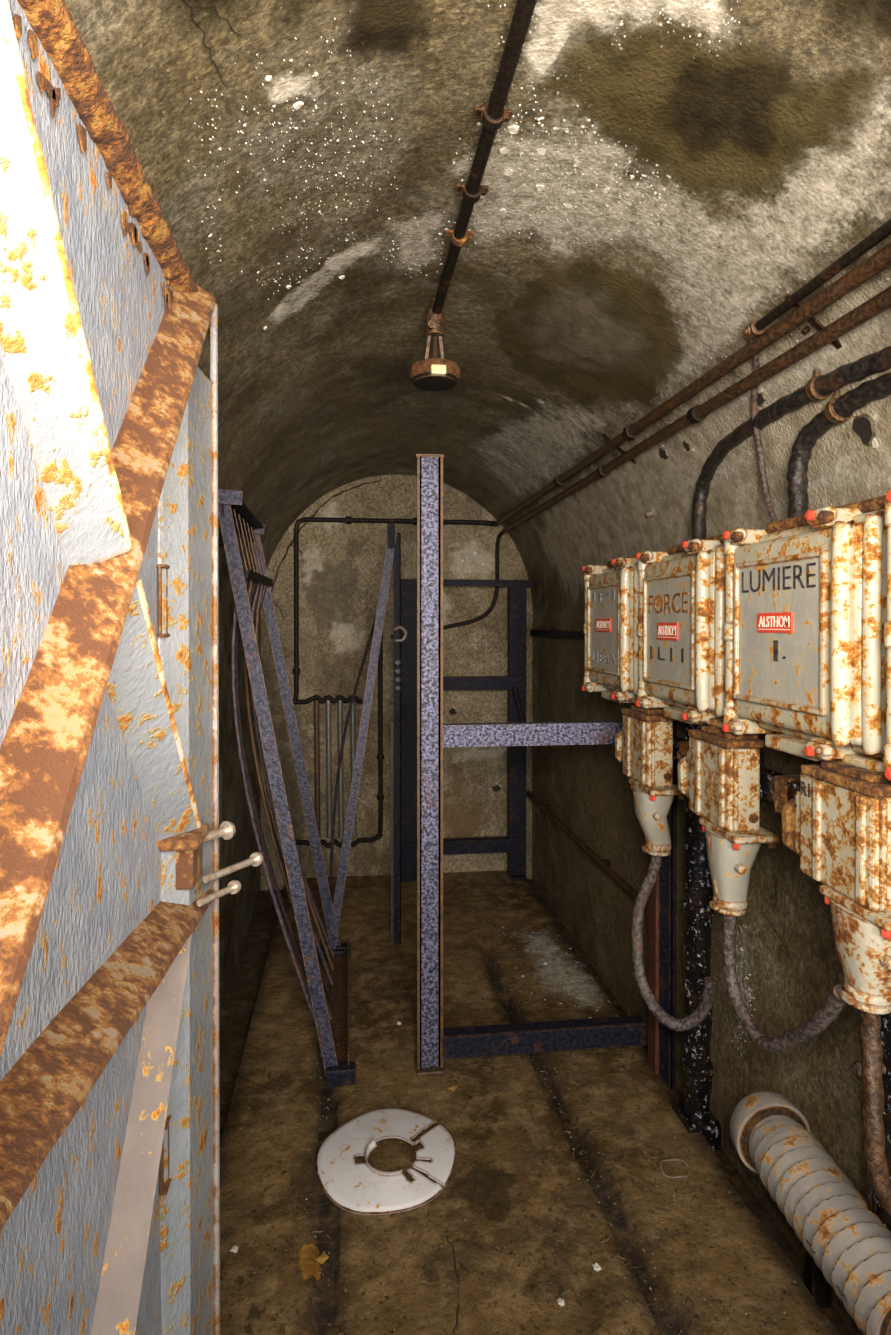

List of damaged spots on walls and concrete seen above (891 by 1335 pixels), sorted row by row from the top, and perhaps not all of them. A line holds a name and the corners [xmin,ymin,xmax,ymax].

damp [188,0,891,611]